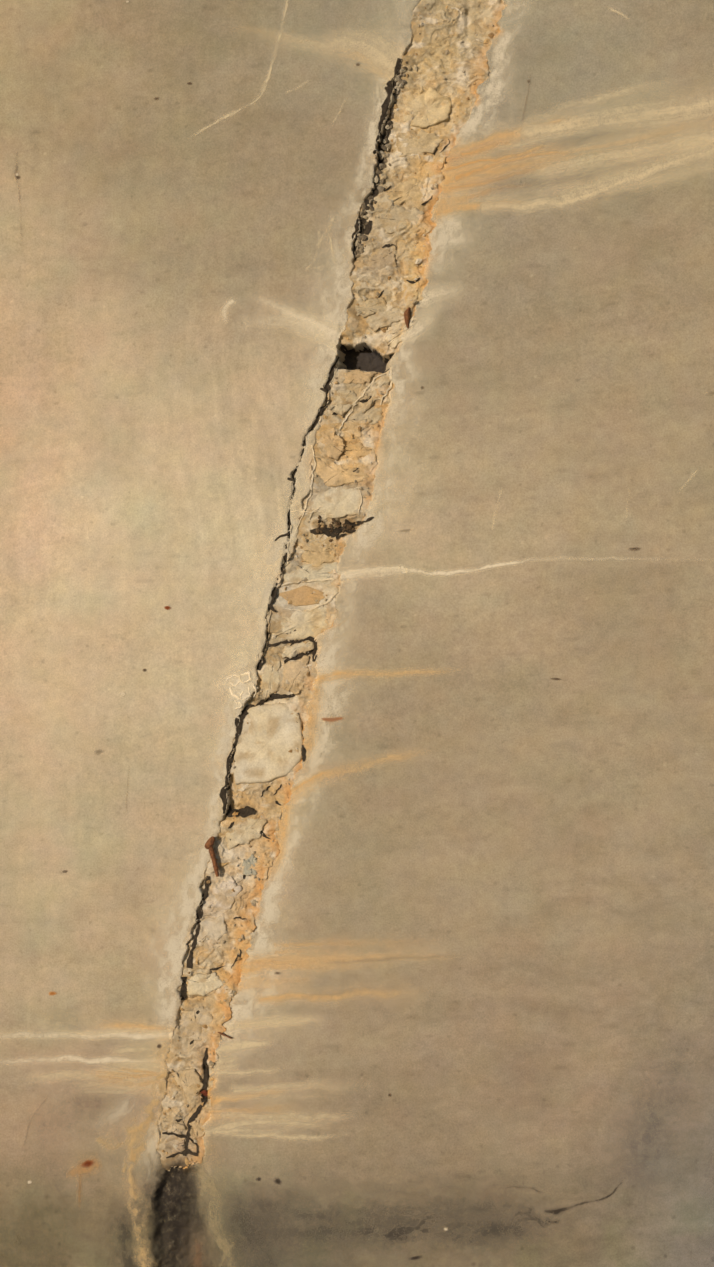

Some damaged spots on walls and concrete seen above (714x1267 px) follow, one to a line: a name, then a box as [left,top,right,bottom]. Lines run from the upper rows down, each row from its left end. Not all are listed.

crack [351,58,402,260]
rust [433,88,714,217]
crack [219,356,374,818]
spalling [157,0,506,1170]
crack [180,876,211,1000]
crack [162,1048,208,1159]
leakage [114,1119,550,1267]